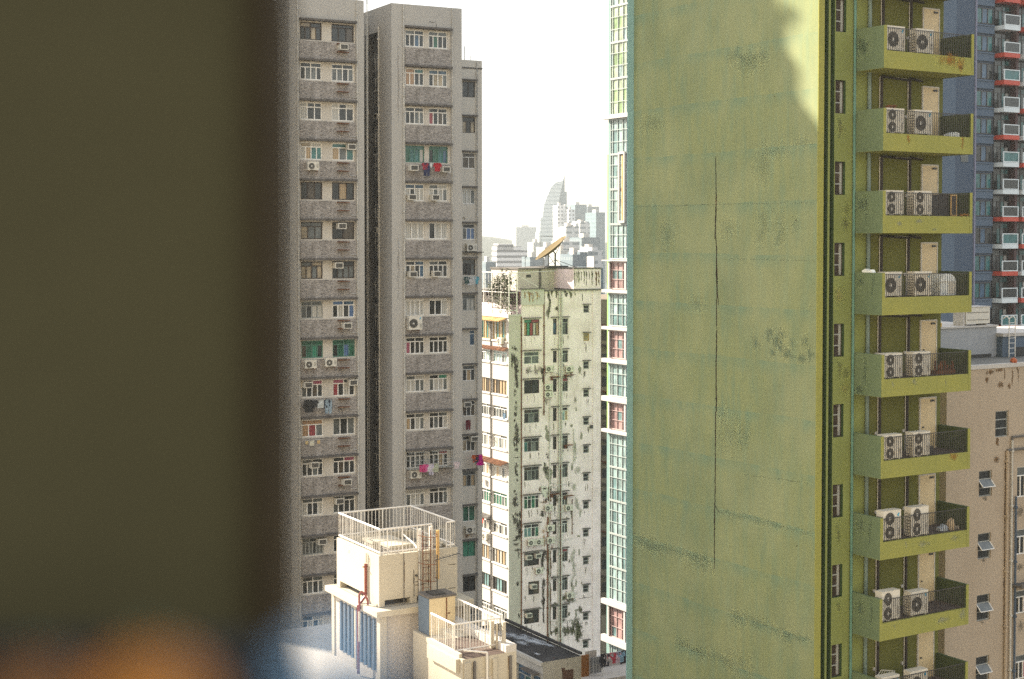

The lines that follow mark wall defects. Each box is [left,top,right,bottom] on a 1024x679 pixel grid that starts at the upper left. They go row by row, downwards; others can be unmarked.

damp [511,347,558,556]
damp [546,271,593,317]
crack [712,156,720,569]
damp [486,549,587,655]